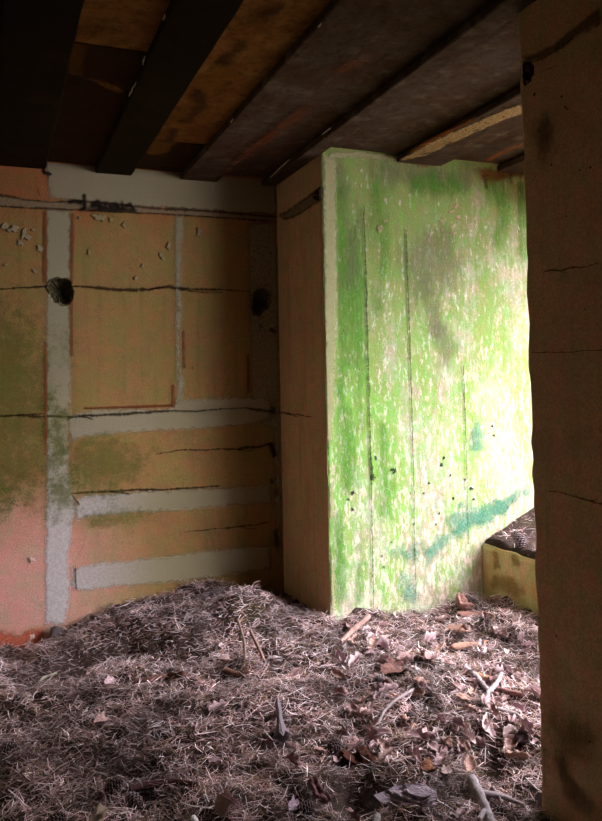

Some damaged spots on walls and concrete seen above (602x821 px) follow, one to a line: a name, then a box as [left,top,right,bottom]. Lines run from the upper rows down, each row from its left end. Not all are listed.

crack [0,284,48,292]
crack [73,285,250,293]
flaking render [1,160,289,625]
crack [0,407,311,420]
crack [159,443,270,454]
crack [71,485,219,505]